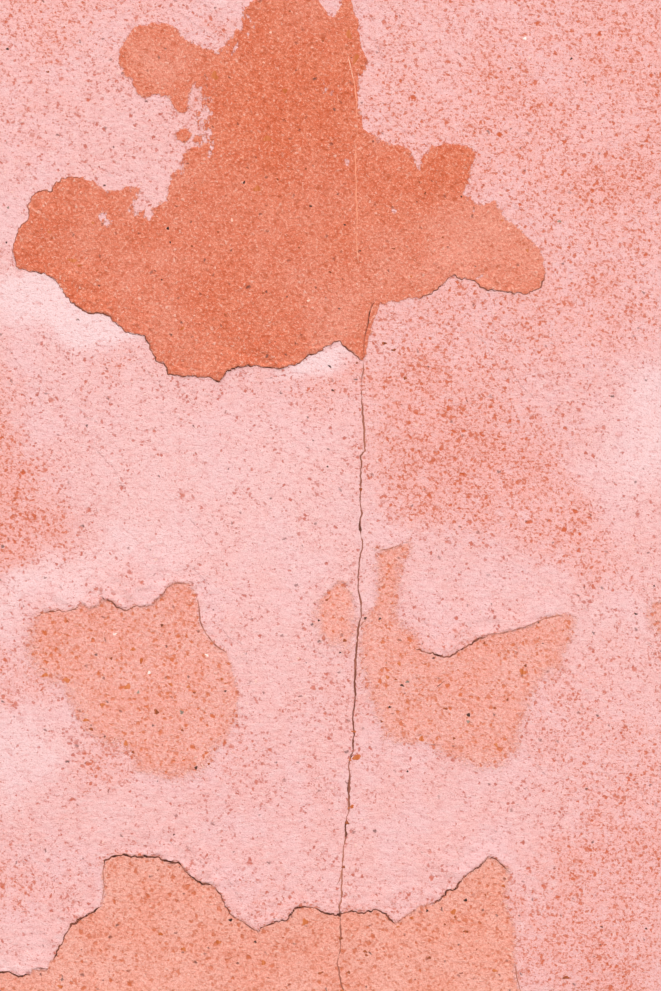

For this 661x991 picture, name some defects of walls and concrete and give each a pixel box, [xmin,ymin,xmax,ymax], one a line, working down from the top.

peeling [0,0,561,398]
peeling [11,566,254,794]
crack [0,305,507,991]
peeling [301,524,591,784]
peeling [0,834,534,991]